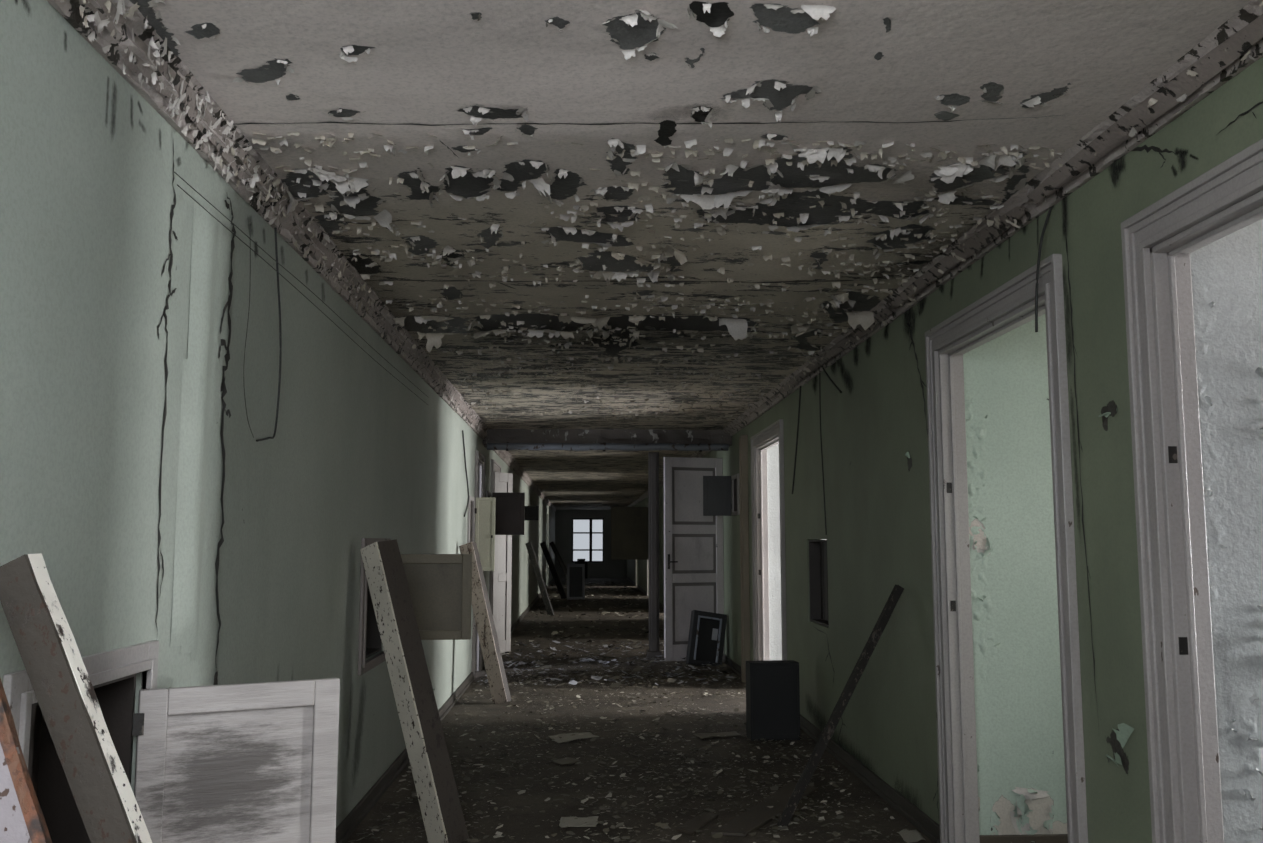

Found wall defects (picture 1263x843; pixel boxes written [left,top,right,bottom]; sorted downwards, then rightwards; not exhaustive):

crack [155,141,178,635]
crack [215,197,236,662]
peeling [79,0,1072,421]
peeling [978,787,1068,843]